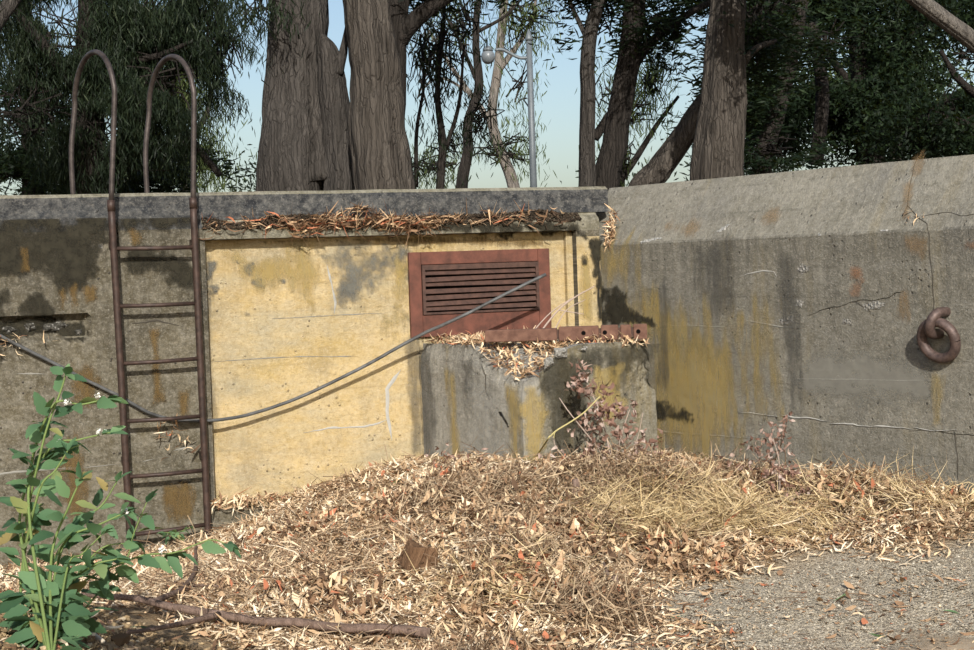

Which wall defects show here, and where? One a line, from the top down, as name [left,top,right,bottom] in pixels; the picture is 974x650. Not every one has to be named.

crack [902,157,973,298]
spalling [2,321,82,335]
leakage [335,246,408,303]
crack [597,260,620,326]
crack [749,291,903,328]
spalling [544,346,588,371]
leakage [629,293,737,460]
crack [741,412,974,466]